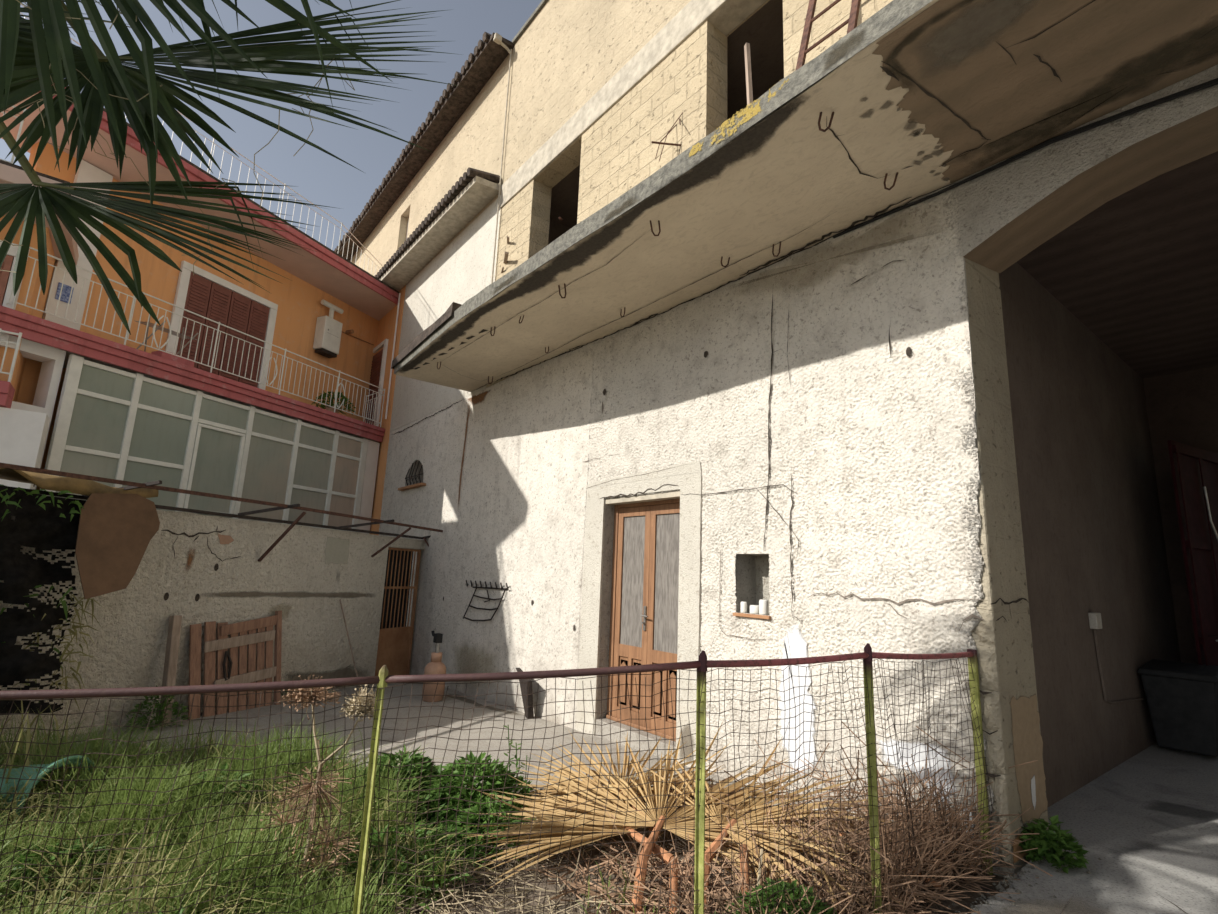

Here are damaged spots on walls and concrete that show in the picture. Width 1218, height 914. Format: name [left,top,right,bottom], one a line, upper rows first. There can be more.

crack [997,0,1095,82]
water stain [399,98,804,372]
crack [392,61,1029,661]